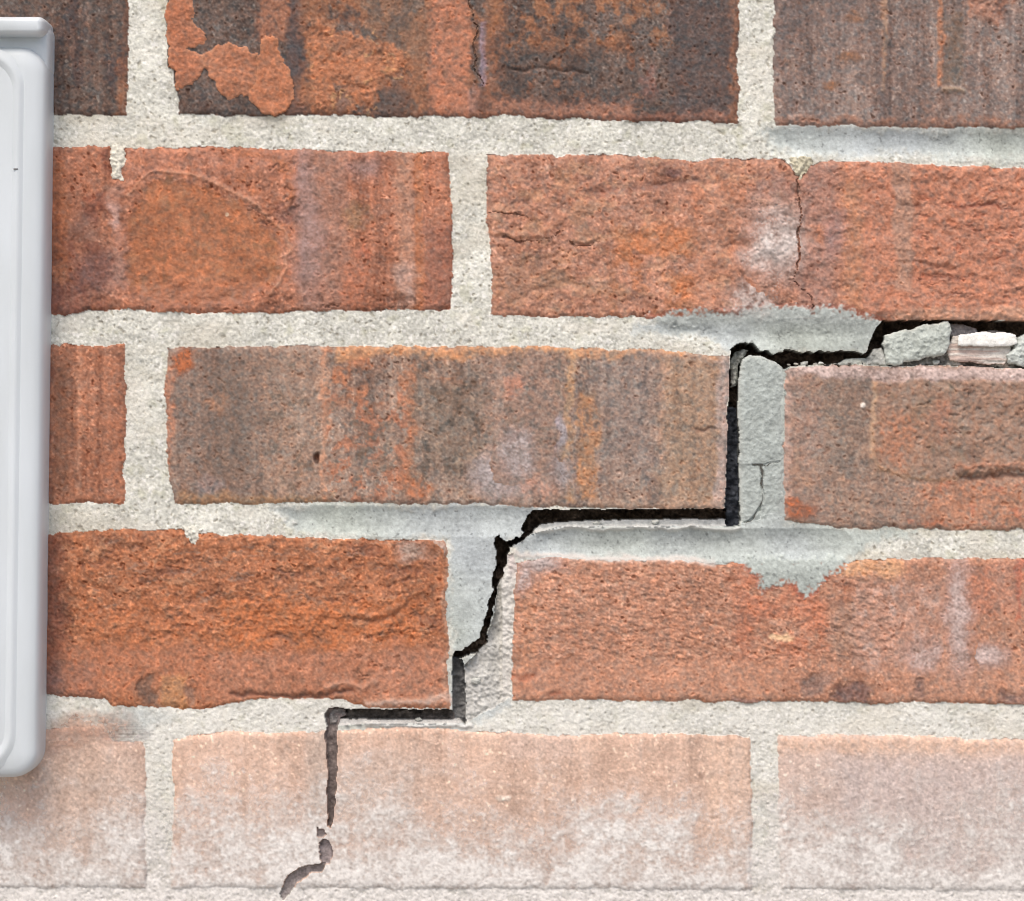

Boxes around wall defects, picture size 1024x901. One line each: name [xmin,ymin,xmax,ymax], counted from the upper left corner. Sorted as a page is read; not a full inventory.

peeling [164,0,412,118]
crack [793,175,815,309]
crack [279,319,1024,901]